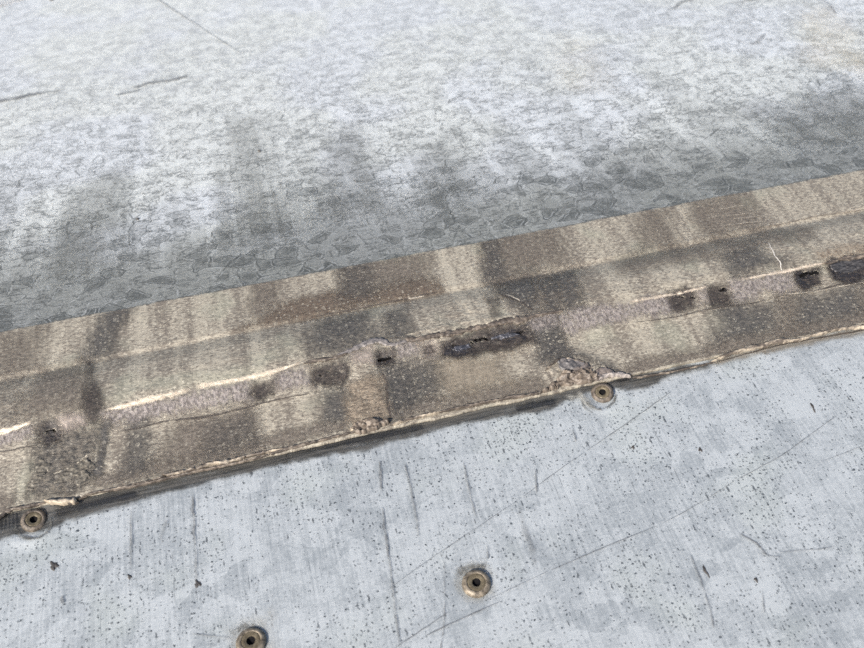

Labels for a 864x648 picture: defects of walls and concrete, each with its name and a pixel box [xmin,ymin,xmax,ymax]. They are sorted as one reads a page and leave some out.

peeling [822,254,864,273]
peeling [303,310,563,364]
peeling [0,324,864,519]